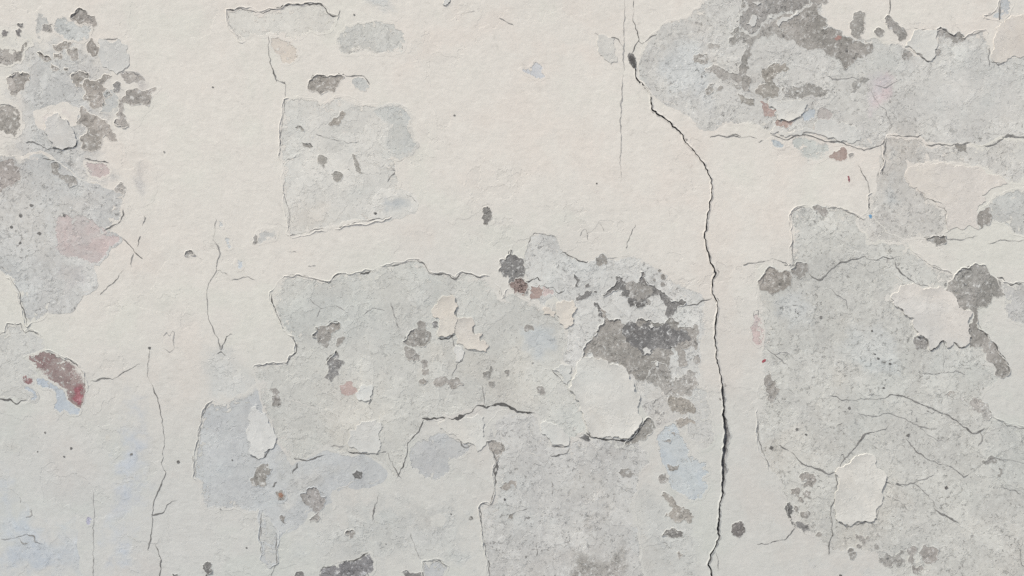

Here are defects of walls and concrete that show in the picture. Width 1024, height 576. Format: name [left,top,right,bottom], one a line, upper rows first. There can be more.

peeling [225,1,408,66]
peeling [0,2,157,406]
crack [96,332,174,576]
crack [206,222,254,354]
peeling [252,73,420,246]
peeling [190,230,717,576]
crack [388,386,534,478]
crack [596,1,1024,576]
peeling [637,0,1024,576]